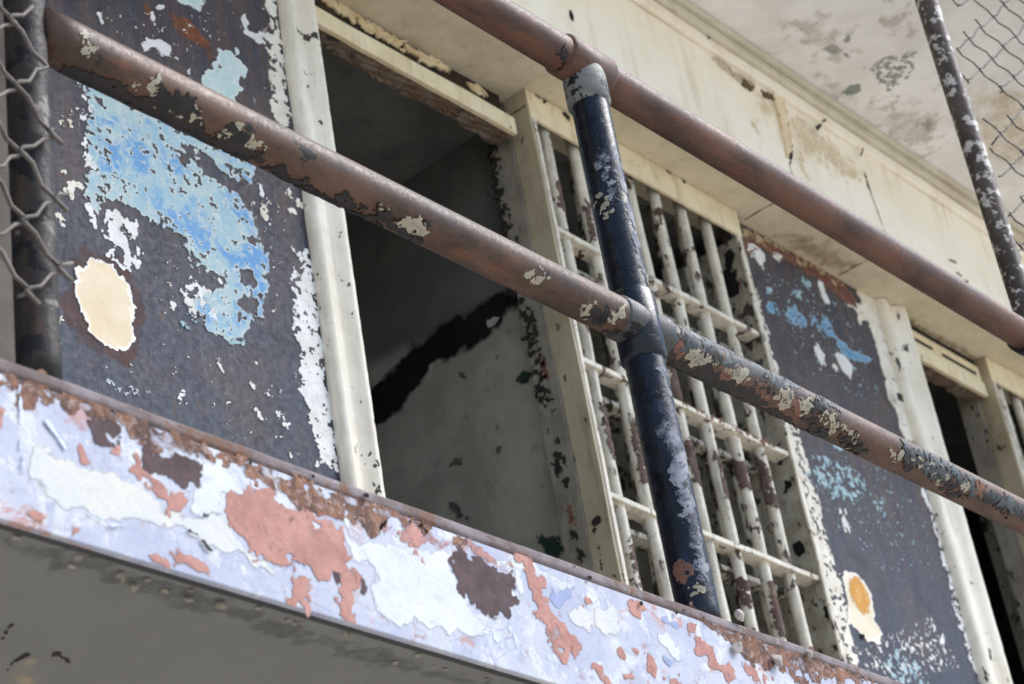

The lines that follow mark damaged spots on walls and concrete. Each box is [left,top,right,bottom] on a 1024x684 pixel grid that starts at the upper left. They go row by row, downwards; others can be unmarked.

peeling [141,4,173,57]
peeling [177,0,206,12]
peeling [241,0,293,127]
peeling [56,29,432,473]
peeling [129,453,190,518]
peeling [148,549,210,573]
rust [0,369,442,539]
peeling [225,480,362,624]
peeling [398,522,433,563]
peeling [514,553,612,684]
peeling [583,596,682,684]
peeling [653,228,1024,684]